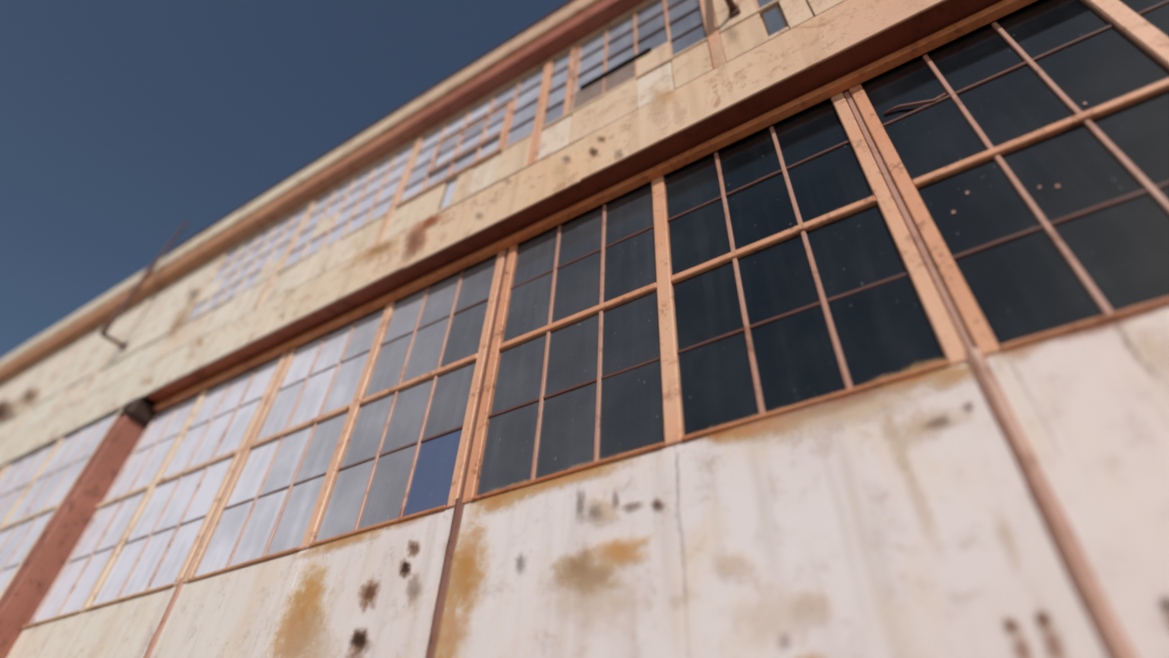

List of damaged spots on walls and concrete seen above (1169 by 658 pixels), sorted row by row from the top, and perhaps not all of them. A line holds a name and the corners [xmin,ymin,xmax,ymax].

rust [1065,311,1149,334]
rust [1004,618,1031,658]
rust [1036,611,1064,658]